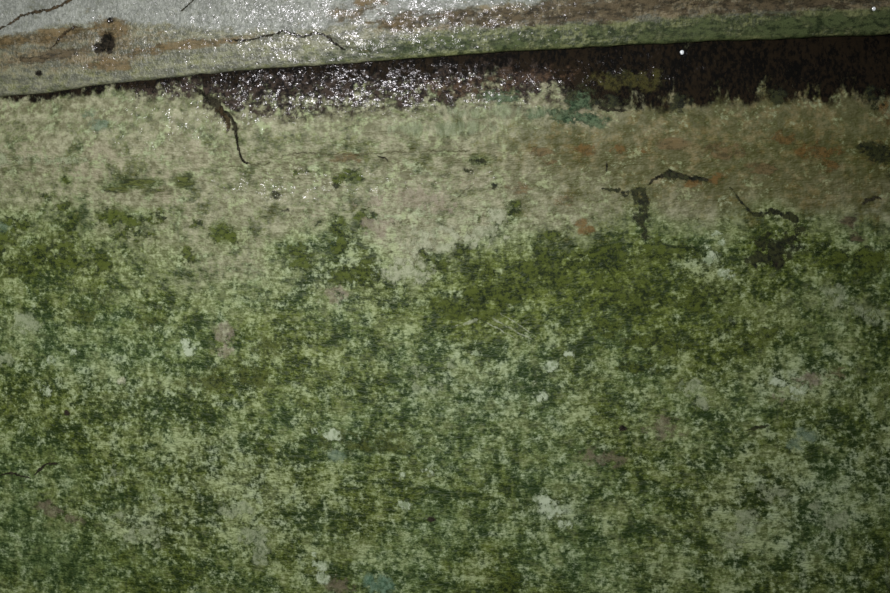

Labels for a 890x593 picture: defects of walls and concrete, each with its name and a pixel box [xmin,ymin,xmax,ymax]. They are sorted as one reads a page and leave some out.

crack [0,0,72,30]
corrosion [333,0,705,31]
corrosion [714,0,880,14]
crack [225,30,371,52]
water stain [3,10,890,112]
crack [195,89,469,166]
crack [601,163,799,225]